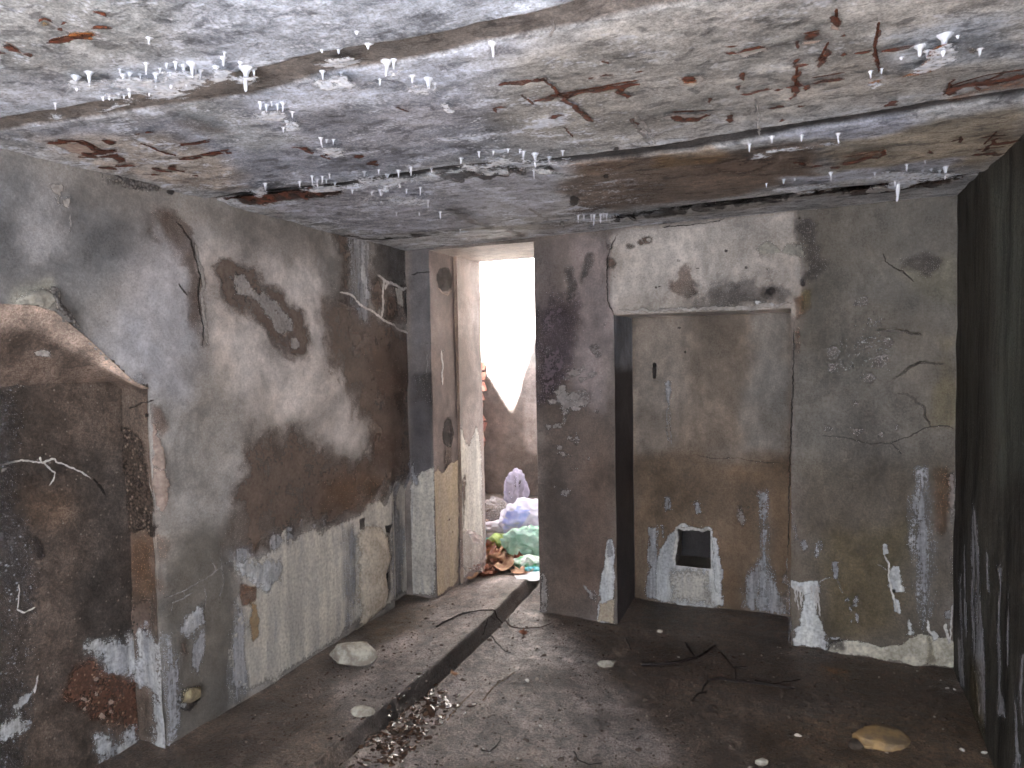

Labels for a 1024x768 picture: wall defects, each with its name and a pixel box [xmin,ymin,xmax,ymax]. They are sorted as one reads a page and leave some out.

efflorescence [65,51,258,112]
efflorescence [316,137,345,158]
water stain [459,148,575,179]
efflorescence [298,167,441,219]
crack [178,223,208,345]
crack [340,271,429,335]
crack [905,361,942,373]
crack [851,405,953,453]
crack [12,456,106,495]
water stain [213,233,483,701]
spalling [240,585,259,641]